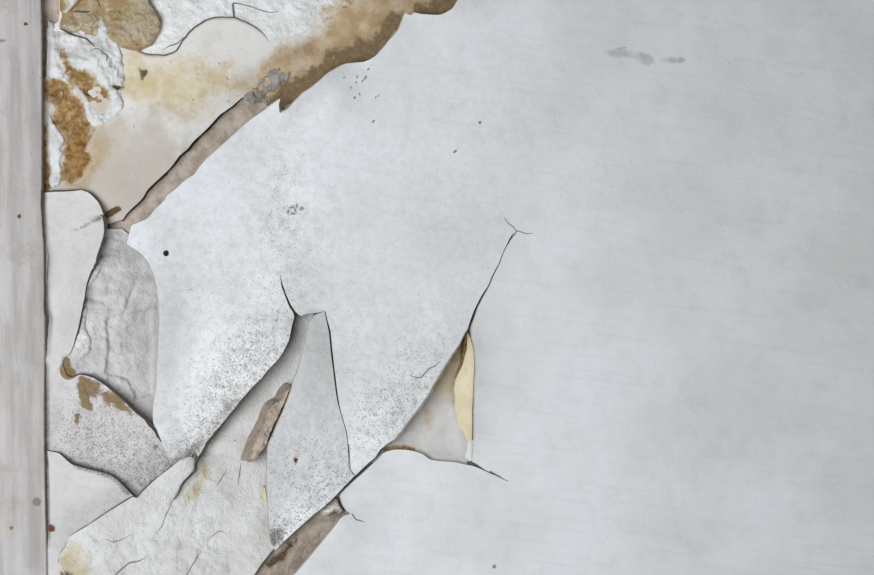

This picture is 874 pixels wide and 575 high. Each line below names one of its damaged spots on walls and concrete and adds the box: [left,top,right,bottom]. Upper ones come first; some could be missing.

damp [262,0,457,110]
peeling [43,0,515,575]
crack [280,275,298,317]
crack [468,219,532,329]
crack [325,314,350,469]